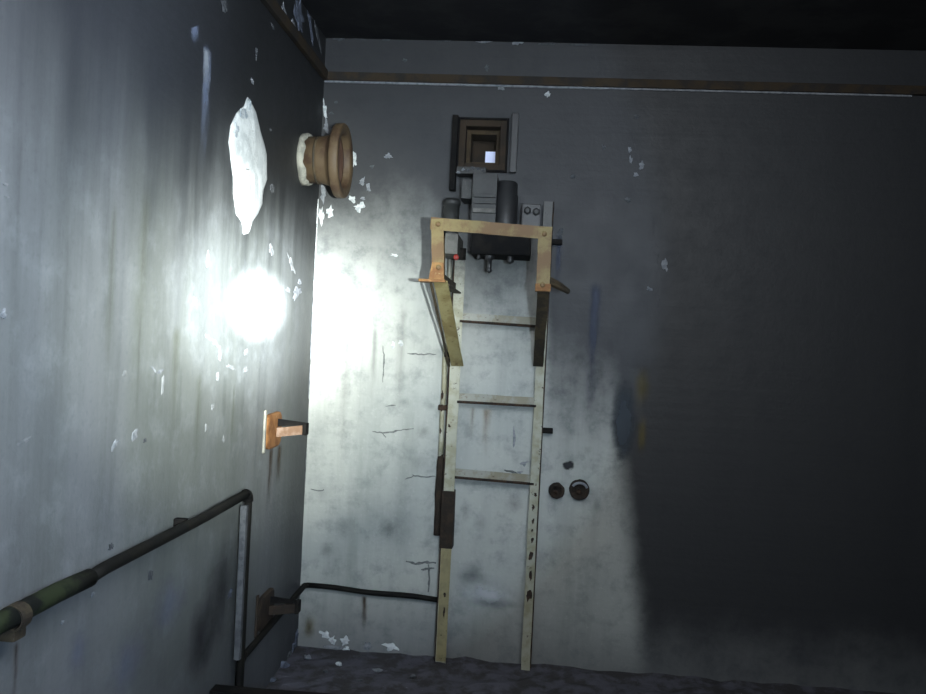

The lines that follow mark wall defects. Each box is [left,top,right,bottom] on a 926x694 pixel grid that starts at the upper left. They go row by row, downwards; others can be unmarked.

peeling [281,0,322,55]
peeling [323,98,338,133]
peeling [349,165,374,213]
peeling [308,184,334,399]
crack [372,428,414,438]
crack [406,561,436,592]